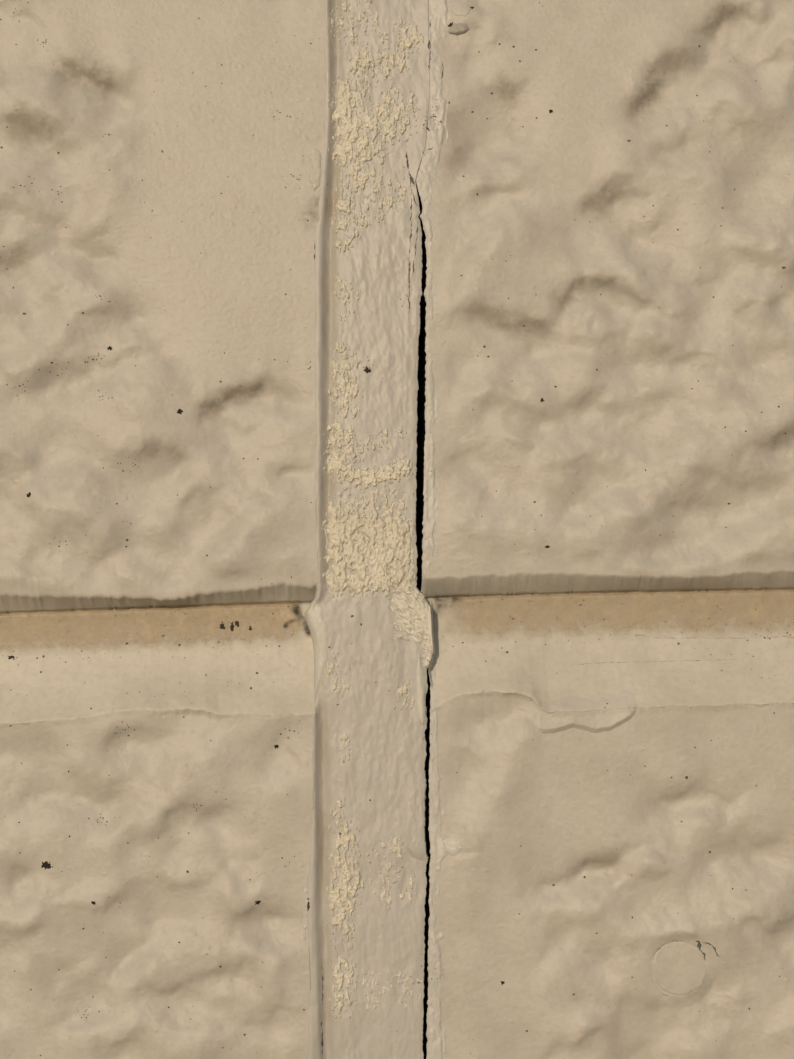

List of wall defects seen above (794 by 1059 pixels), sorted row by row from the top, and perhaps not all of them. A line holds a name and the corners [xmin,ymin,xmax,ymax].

crack [406,24,443,591]
crack [423,668,431,1059]